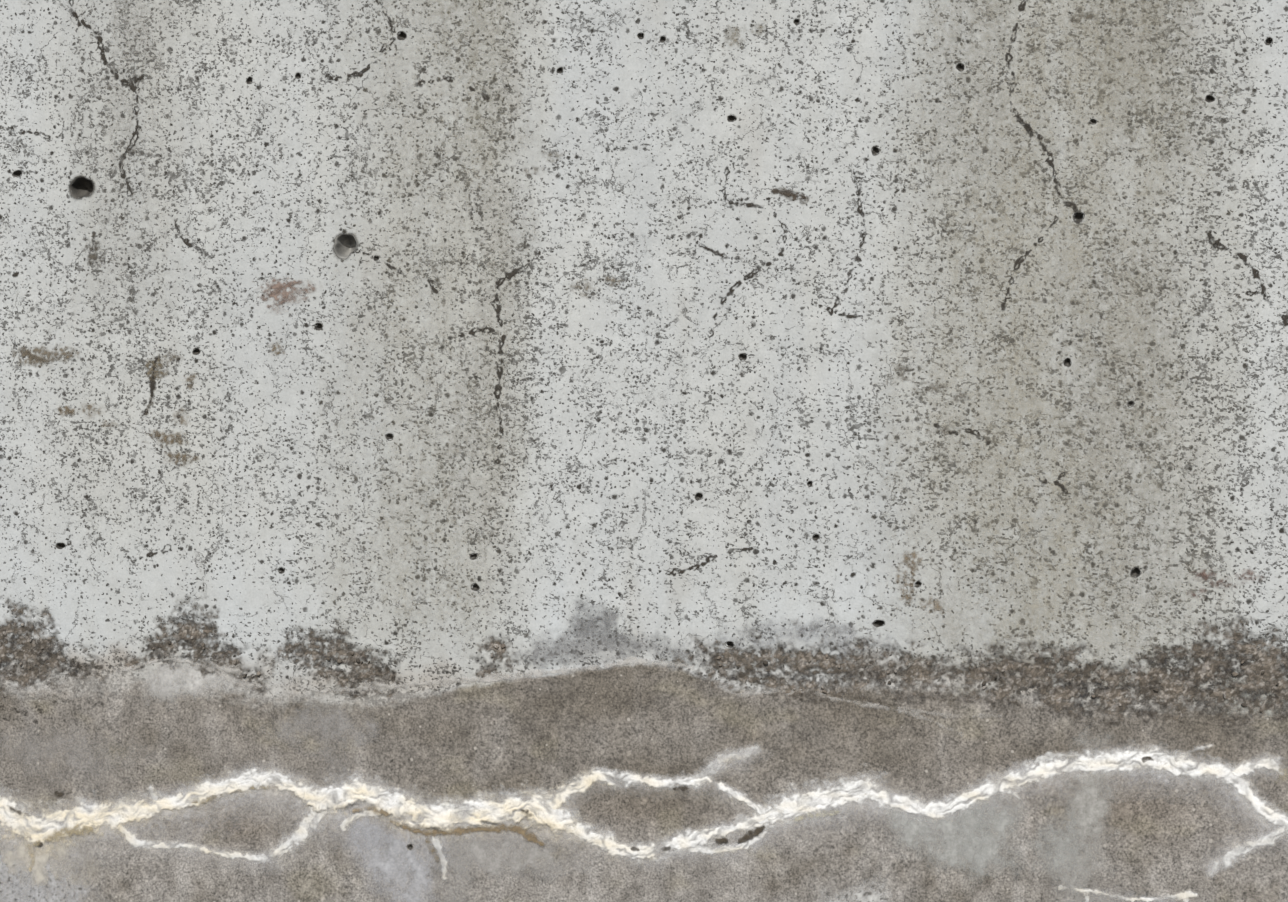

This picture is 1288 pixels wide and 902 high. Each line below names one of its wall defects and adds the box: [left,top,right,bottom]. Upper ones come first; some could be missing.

crack [69,0,145,209]
crack [1001,0,1078,310]
crack [460,251,541,464]
spalling [0,599,104,700]
spalling [124,601,399,699]
spalling [476,636,517,682]
spalling [674,619,1288,725]
leakage [350,816,553,902]
crack [0,745,1288,902]
leakage [891,800,1014,875]
leakage [1036,756,1107,891]